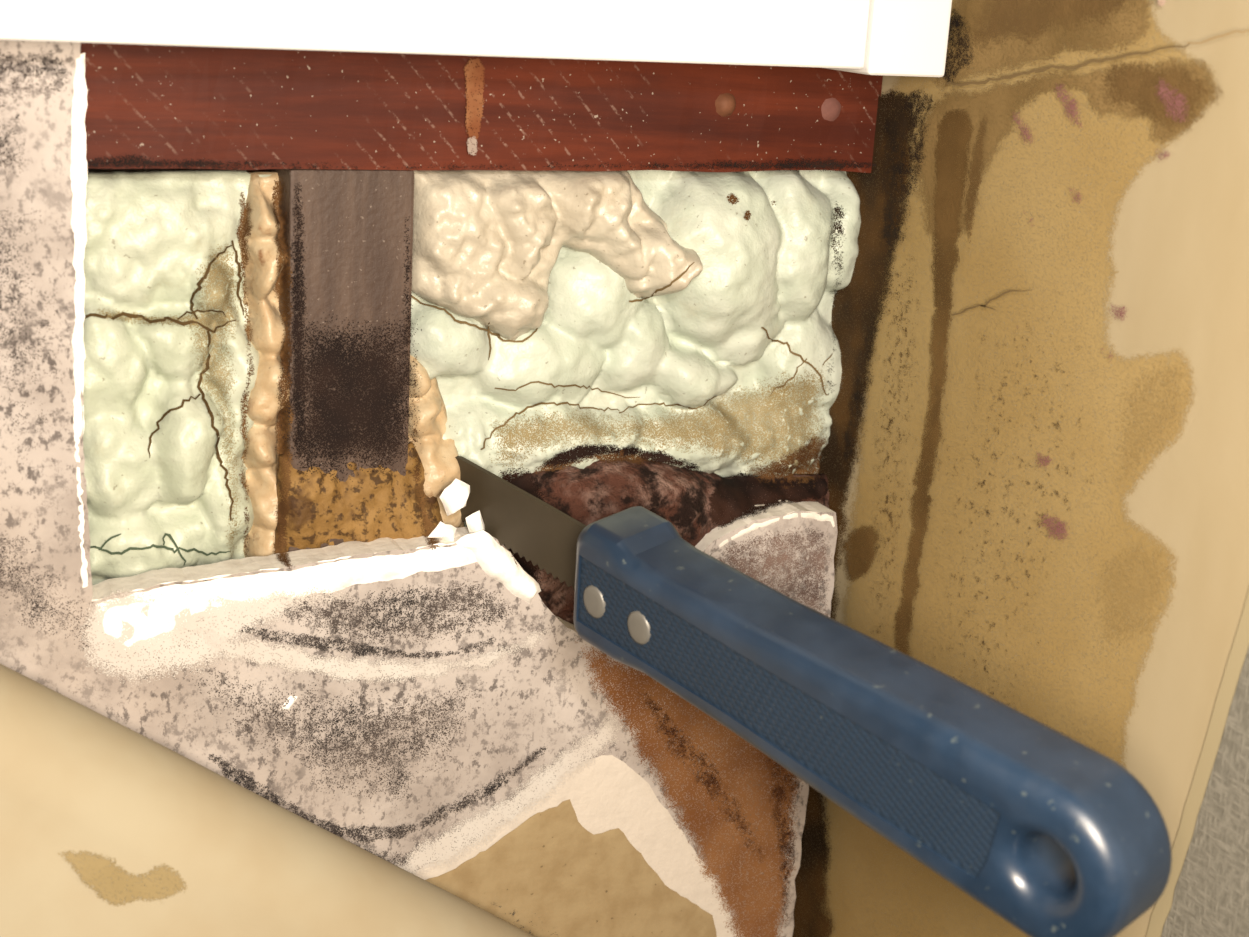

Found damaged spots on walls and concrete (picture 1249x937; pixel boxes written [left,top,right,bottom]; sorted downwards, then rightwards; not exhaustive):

mould [0,49,73,181]
crack [946,30,1249,86]
mould [0,207,57,464]
leakage [489,0,1224,767]
mould [0,534,127,653]
mould [240,578,513,660]
mould [183,664,484,806]
mould [209,746,547,866]